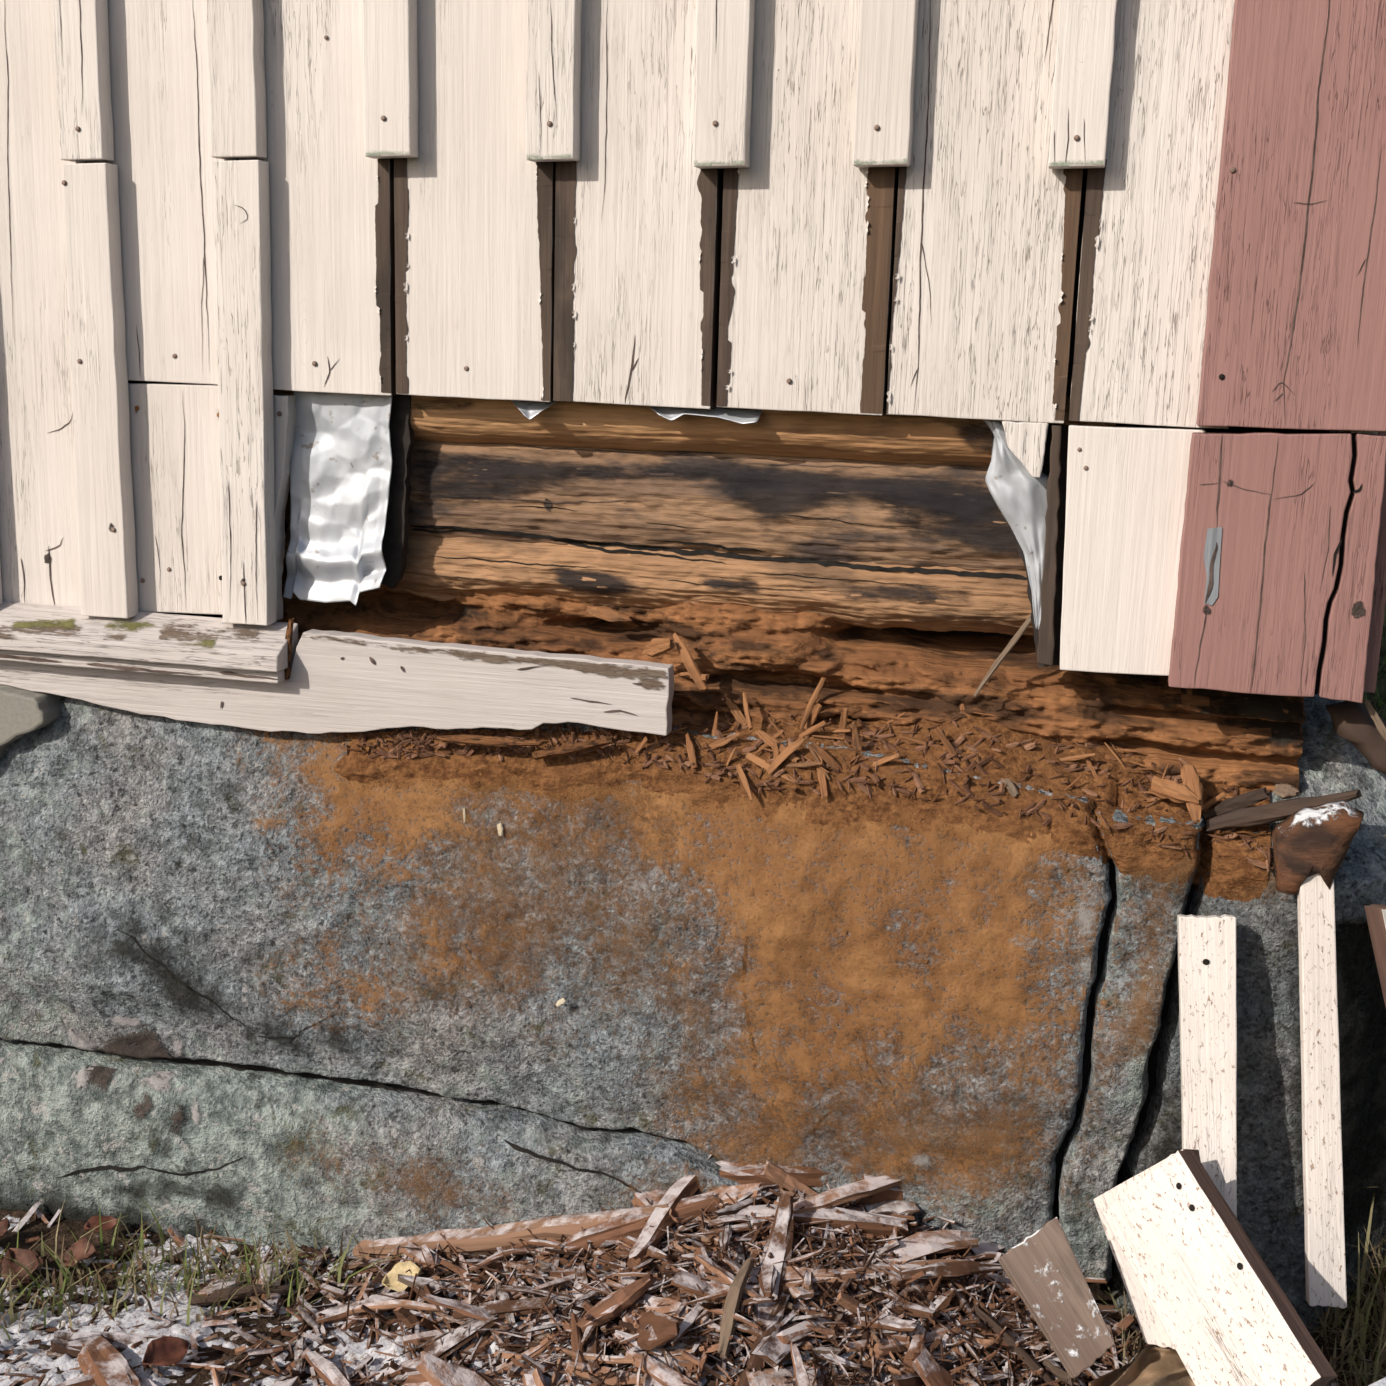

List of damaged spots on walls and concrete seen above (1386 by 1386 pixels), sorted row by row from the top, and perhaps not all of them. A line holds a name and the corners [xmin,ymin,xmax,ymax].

crack [1199,0,1362,695]
damp [416,449,1018,554]
damp [553,568,633,595]
damp [704,579,756,593]
damp [849,586,942,602]
peeling [310,636,668,690]
crack [1194,615,1206,686]
corrosion [237,729,1195,1211]
crack [20,928,722,1160]
crack [1055,858,1117,1184]
crack [56,1156,245,1178]
crack [503,1139,641,1193]